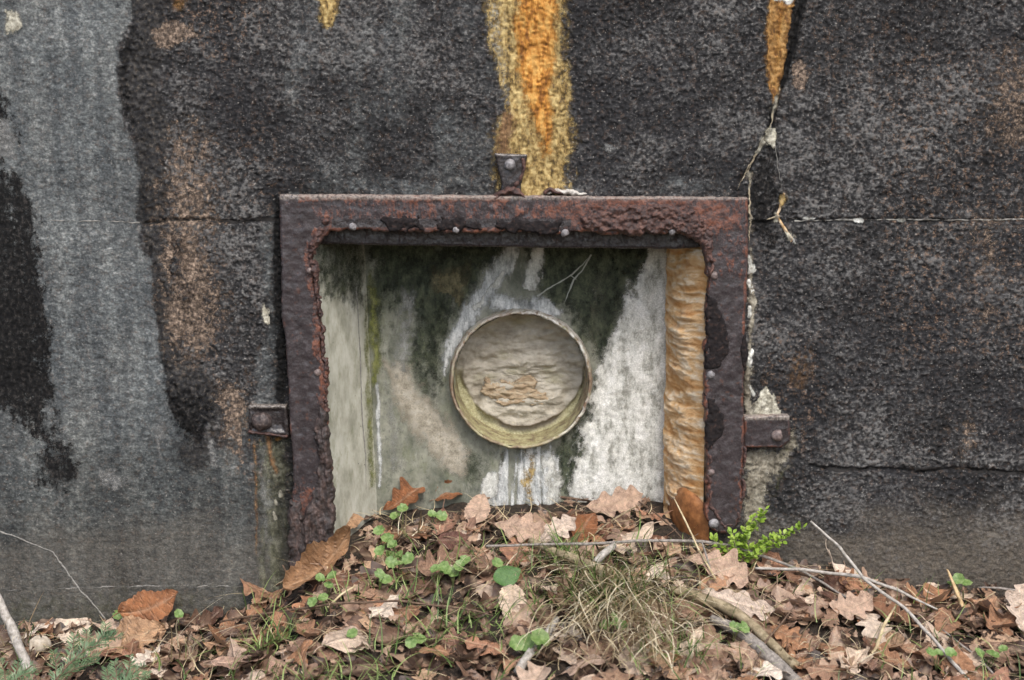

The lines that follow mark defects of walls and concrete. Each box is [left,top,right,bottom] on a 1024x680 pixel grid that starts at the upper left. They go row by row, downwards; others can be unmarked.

damp [0,93,81,494]
damp [116,0,221,473]
damp [272,198,287,403]
corrosion [287,218,336,566]
damp [317,244,667,506]
corrosion [482,0,577,199]
corrosion [580,203,715,277]
corrosion [764,0,808,102]
crack [738,87,1024,260]